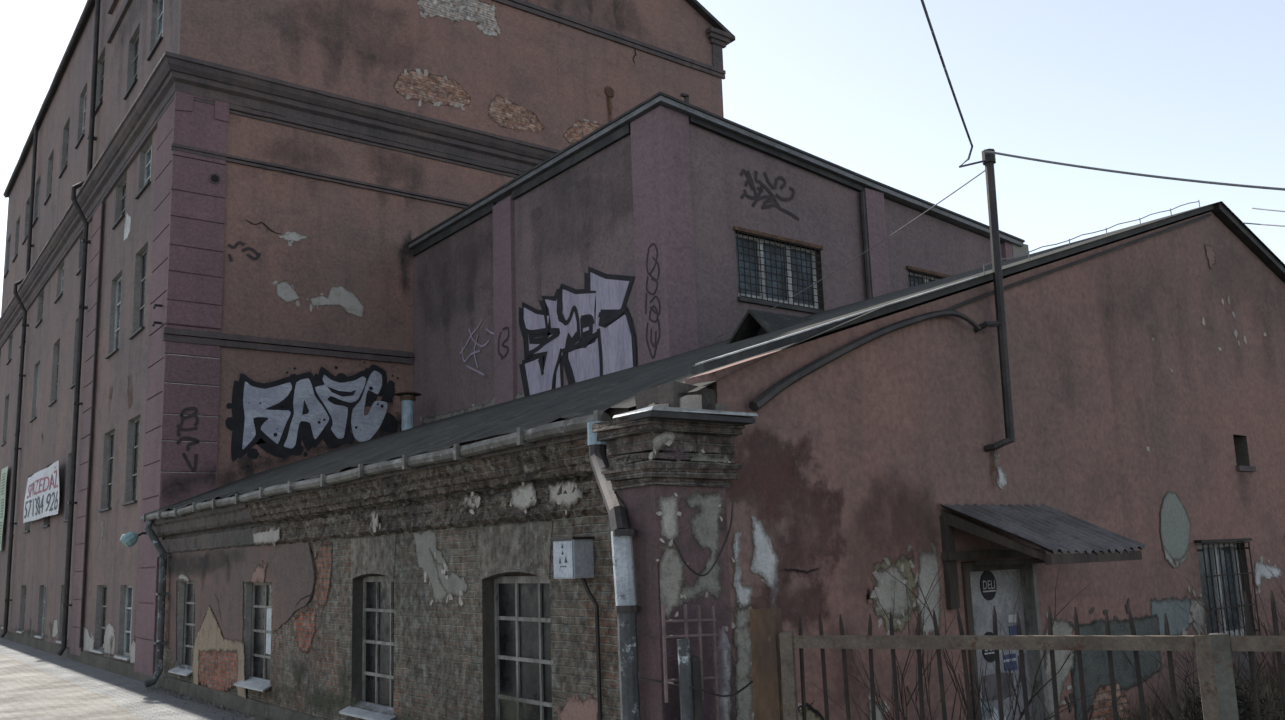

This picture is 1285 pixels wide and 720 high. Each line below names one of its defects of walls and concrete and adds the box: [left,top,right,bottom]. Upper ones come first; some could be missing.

flaking render [417,0,500,37]
flaking render [394,68,471,110]
flaking render [279,231,308,246]
flaking render [273,281,364,318]
crack [295,541,318,607]
flaking render [412,529,470,606]
flaking render [656,491,779,720]
damp [730,429,845,626]
flaking render [869,543,941,635]
flaking render [1160,491,1192,568]
flaking render [192,605,246,698]
spalling [1043,586,1208,720]